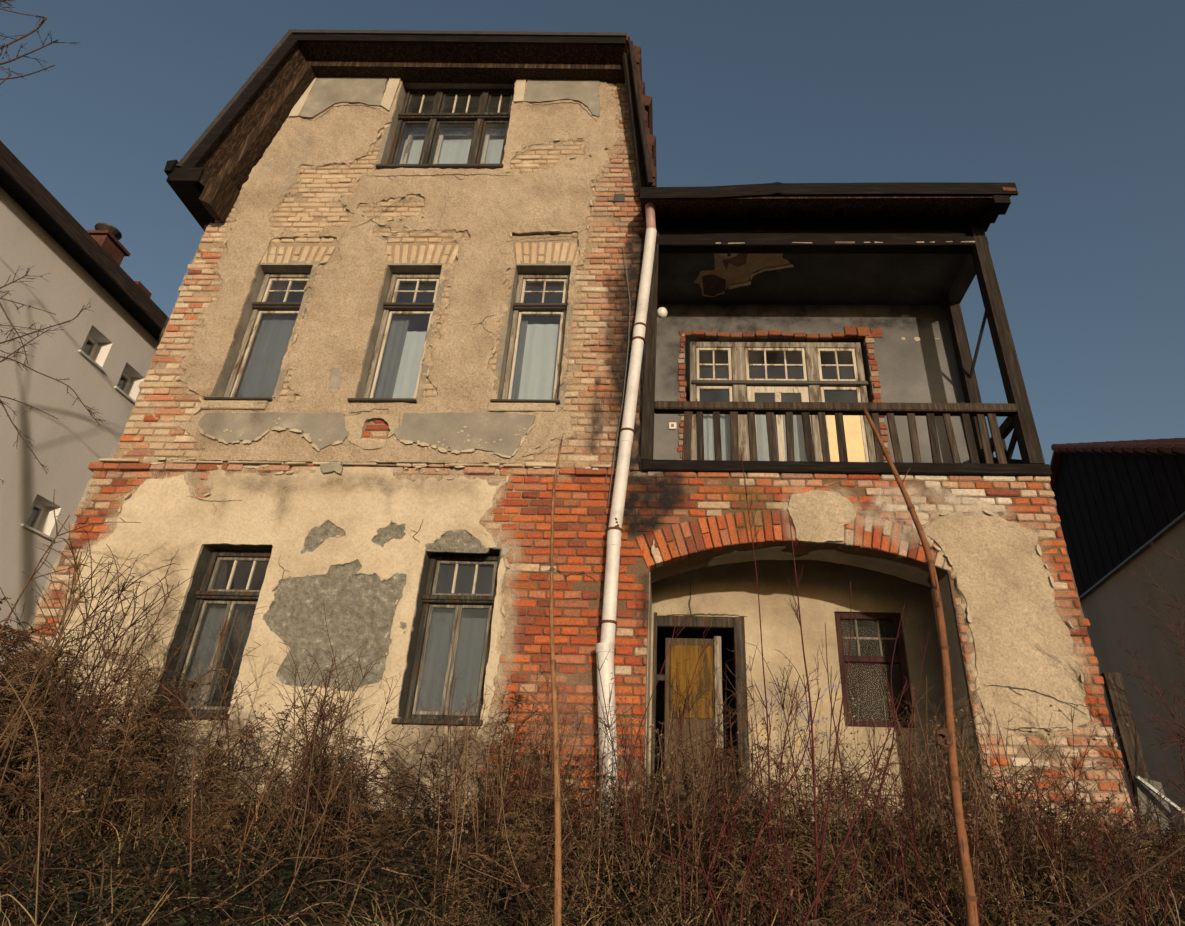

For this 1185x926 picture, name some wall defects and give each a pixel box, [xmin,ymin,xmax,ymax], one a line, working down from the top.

spalling [3,199,346,715]
peeling [263,560,414,692]
spalling [261,125,471,403]
spalling [361,83,1137,839]